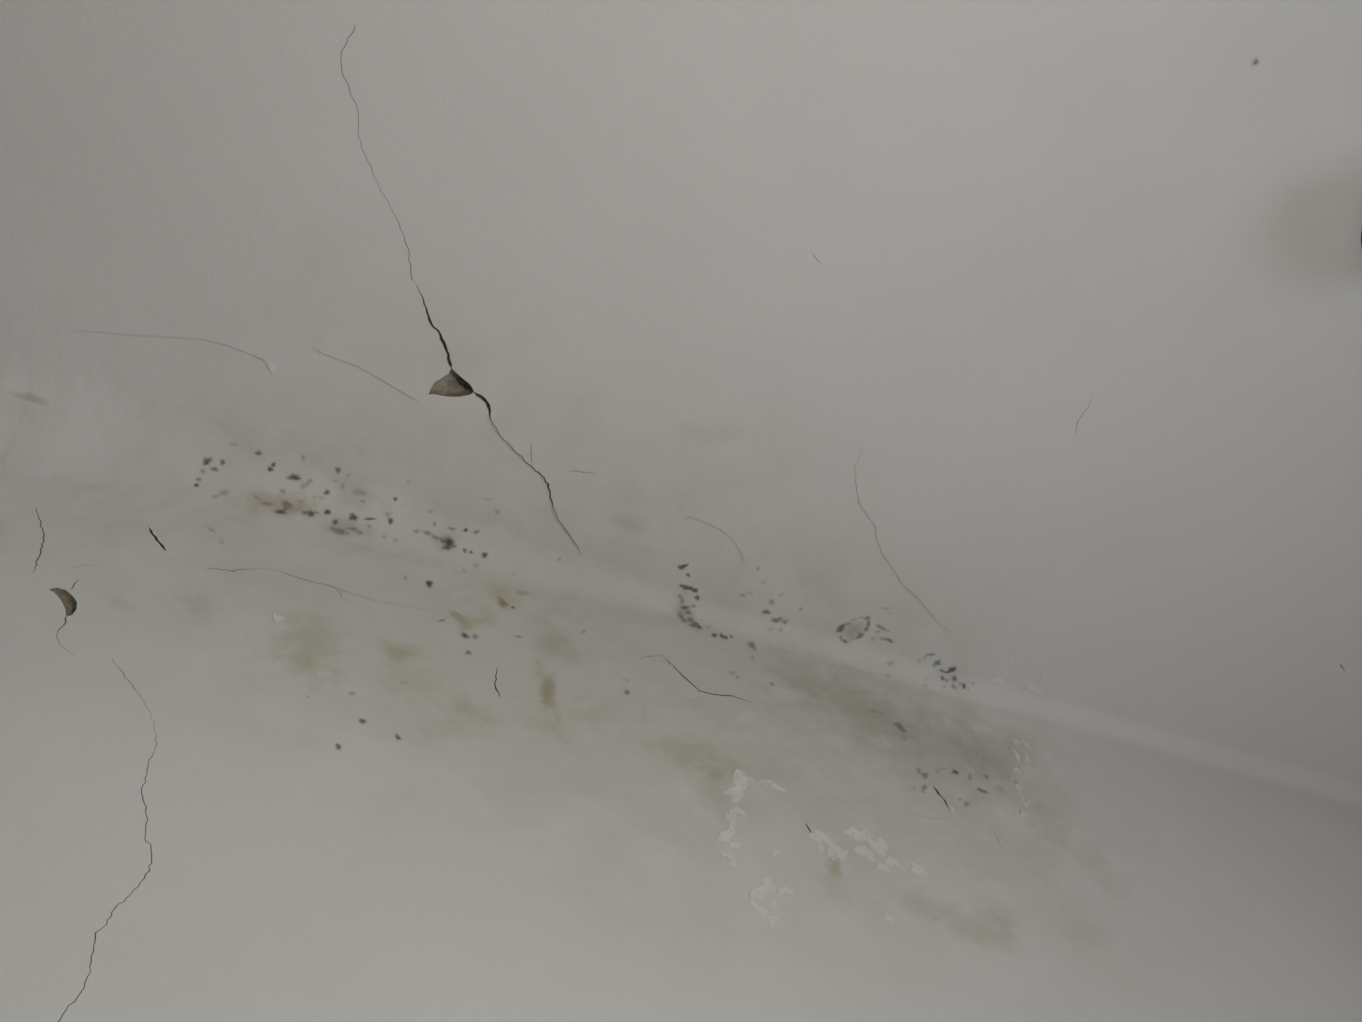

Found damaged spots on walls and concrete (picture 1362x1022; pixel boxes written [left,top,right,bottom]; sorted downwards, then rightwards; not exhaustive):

crack [341,24,598,554]
spalling [428,369,473,397]
crack [33,509,45,573]
crack [56,565,92,656]
crack [640,655,755,705]
crack [57,660,157,1022]
peeling [718,769,787,867]
peeling [808,826,929,876]